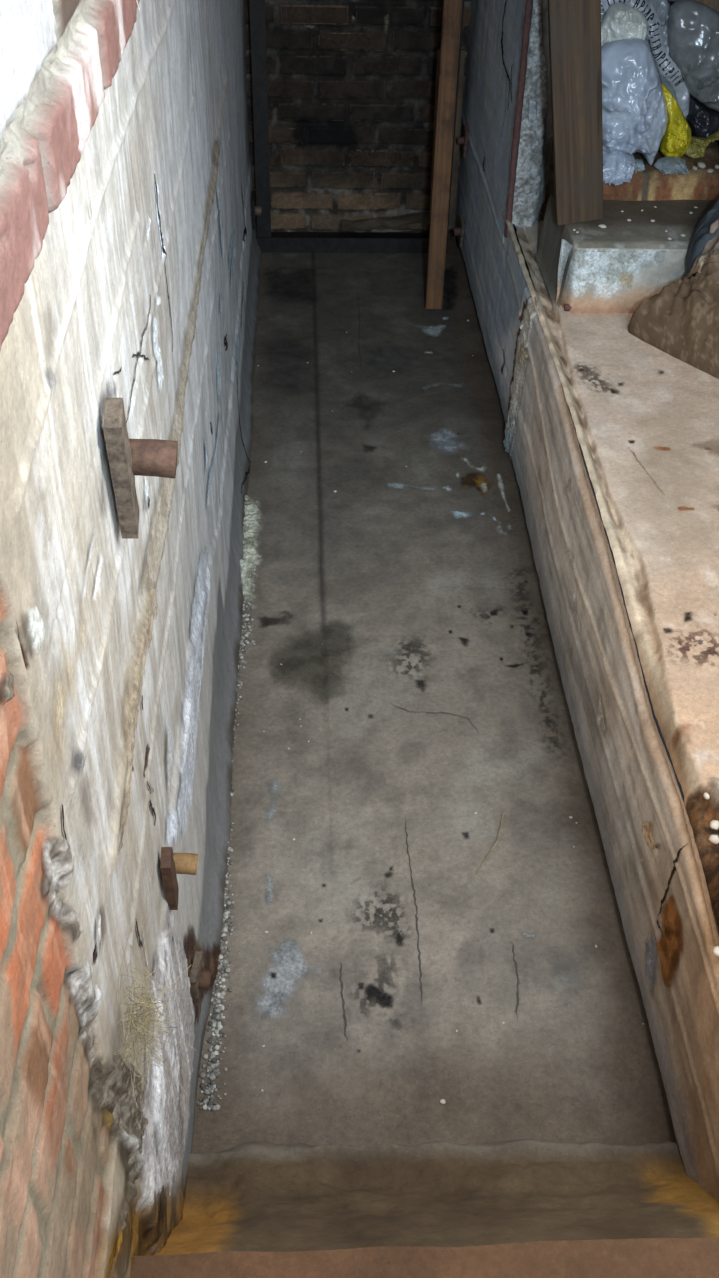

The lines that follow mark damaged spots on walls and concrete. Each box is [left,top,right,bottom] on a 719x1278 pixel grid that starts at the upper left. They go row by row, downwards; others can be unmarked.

crack [114,172,173,423]
efflorescence [240,495,261,600]
leakage [261,614,291,626]
leakage [276,624,351,698]
corrosion [656,896,682,987]
spalling [44,838,148,1229]